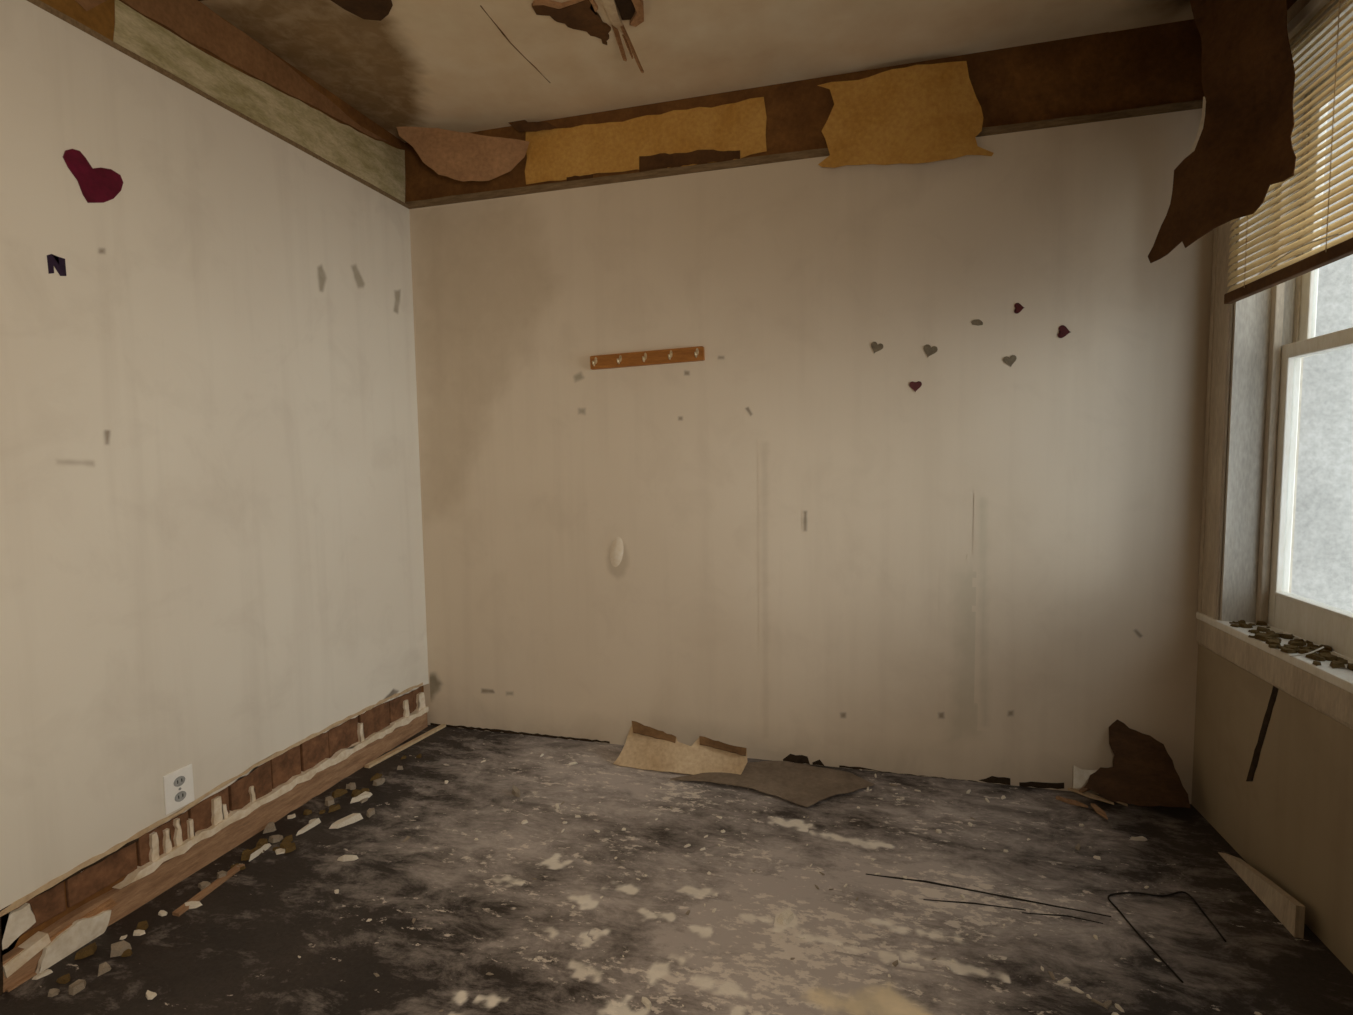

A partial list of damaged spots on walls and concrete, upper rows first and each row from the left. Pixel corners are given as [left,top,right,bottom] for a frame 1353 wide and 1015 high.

peeling [532,0,644,73]
peeling [508,120,557,132]
spalling [0,682,428,995]